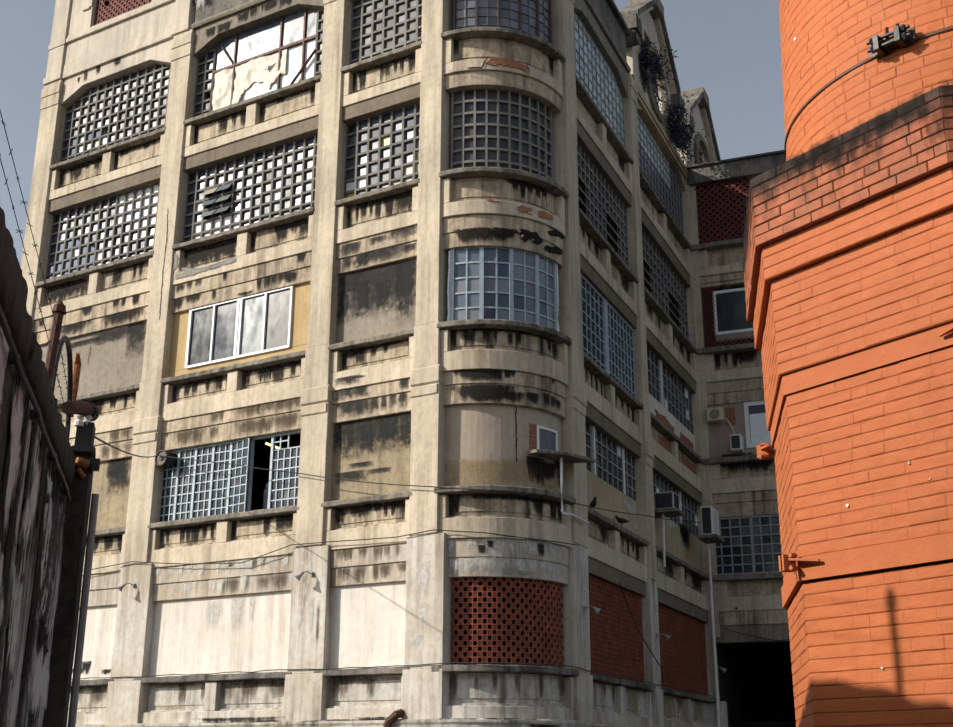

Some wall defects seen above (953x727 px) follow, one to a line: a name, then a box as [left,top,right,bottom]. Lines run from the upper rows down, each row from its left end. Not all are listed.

leakage [206,0,292,36]
spalling [485,57,529,73]
leakage [792,130,859,170]
leakage [454,227,529,242]
spalling [517,204,565,255]
leakage [337,225,417,317]
leakage [450,369,561,409]
leakage [334,378,411,483]
crack [512,406,520,462]
leakage [0,359,67,727]